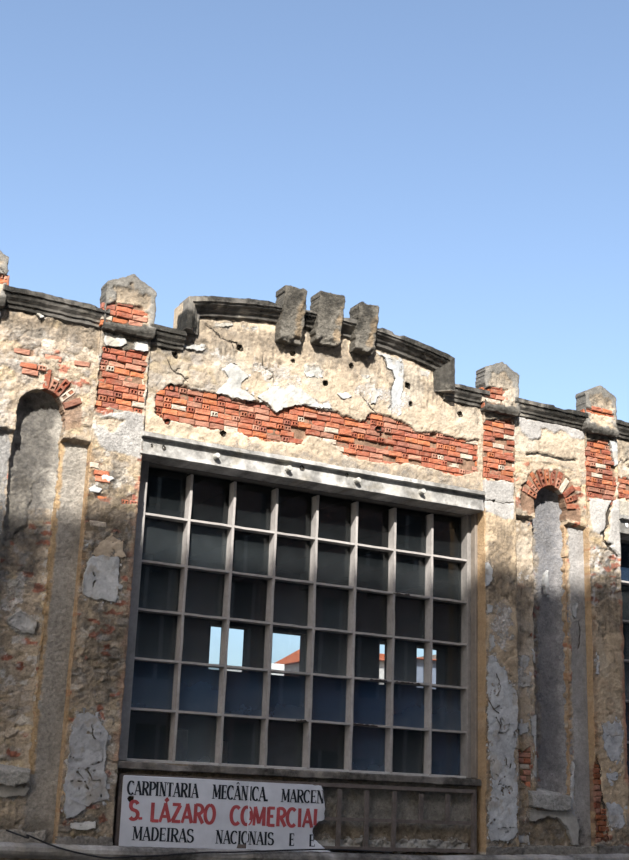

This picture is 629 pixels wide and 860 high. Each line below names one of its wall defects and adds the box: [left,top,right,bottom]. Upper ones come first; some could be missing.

flaking render [14,348,62,377]
flaking render [74,300,515,483]
flaking render [526,439,629,505]
flaking render [580,406,614,417]
peeling [486,635,580,846]
peeling [593,716,627,843]